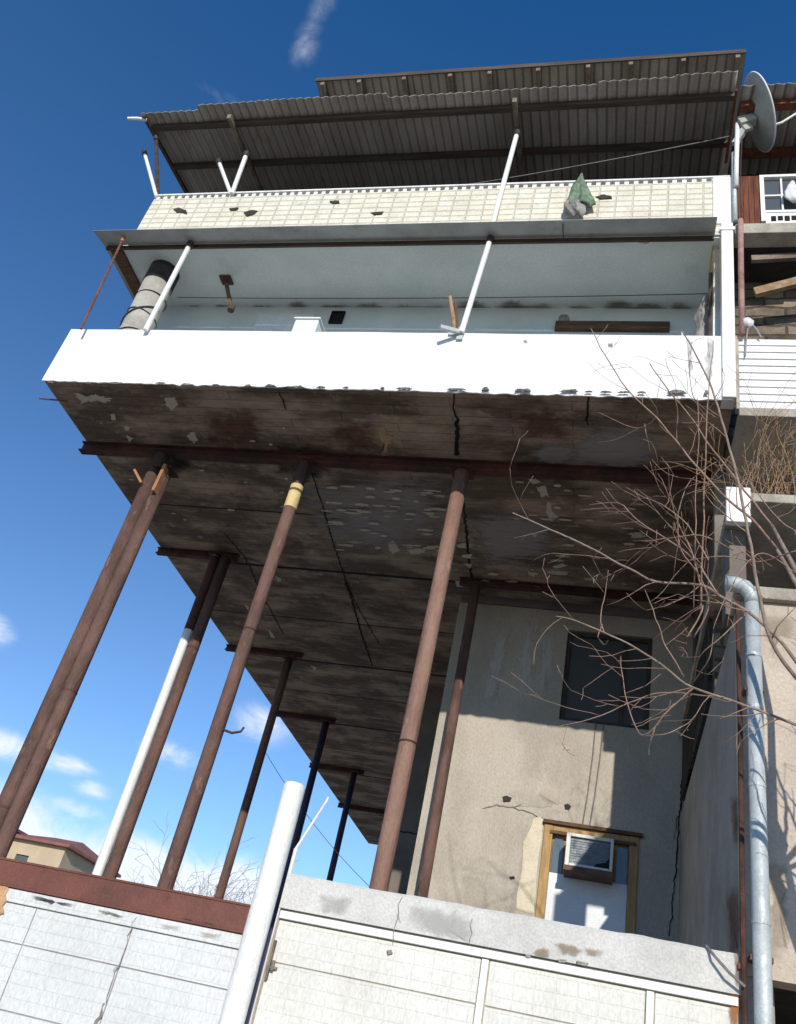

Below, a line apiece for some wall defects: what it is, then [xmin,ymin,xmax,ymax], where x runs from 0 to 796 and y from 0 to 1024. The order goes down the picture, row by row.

flaking render [74,382,135,447]
spalling [154,382,178,411]
crack [452,394,460,456]
crack [583,397,591,425]
crack [312,473,379,666]
flaking render [321,485,447,555]
crack [463,499,473,578]
flaking render [514,479,592,521]
flaking render [527,544,600,587]
crack [668,612,710,936]
crack [482,804,542,818]
damp [535,944,597,957]